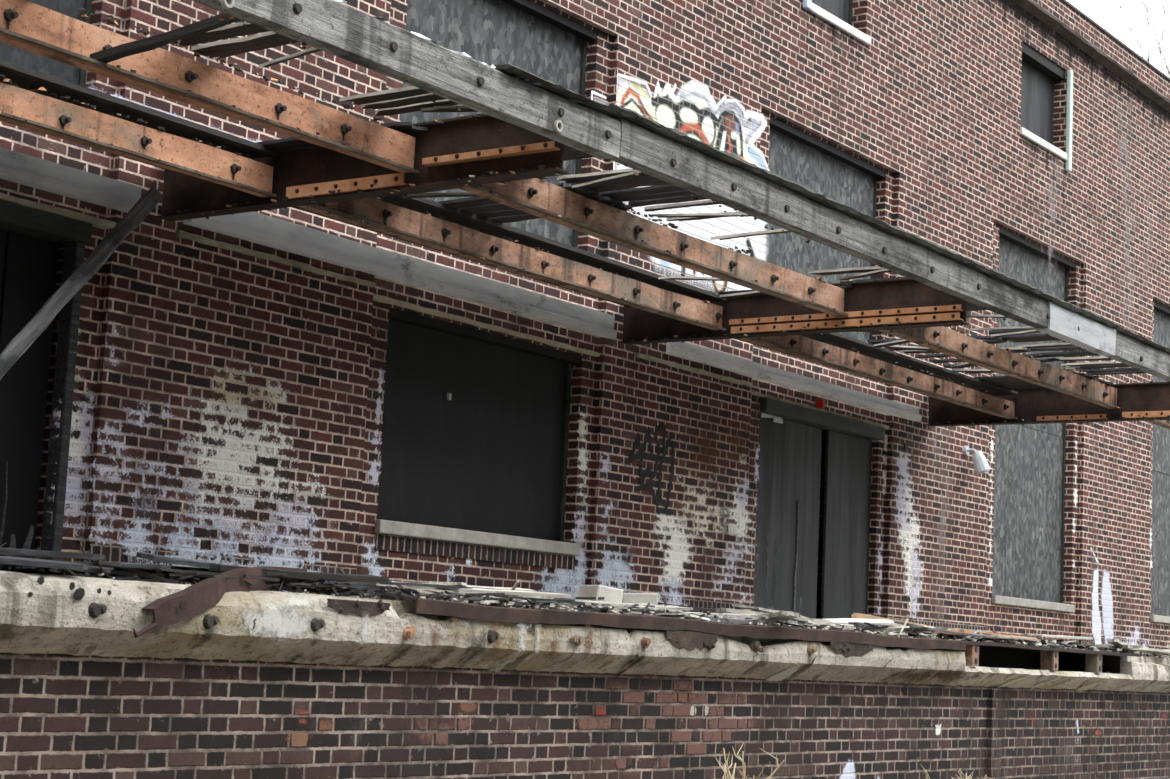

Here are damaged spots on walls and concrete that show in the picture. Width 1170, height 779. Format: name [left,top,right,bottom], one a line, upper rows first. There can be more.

spalling [327,598,390,617]
spalling [666,630,718,650]